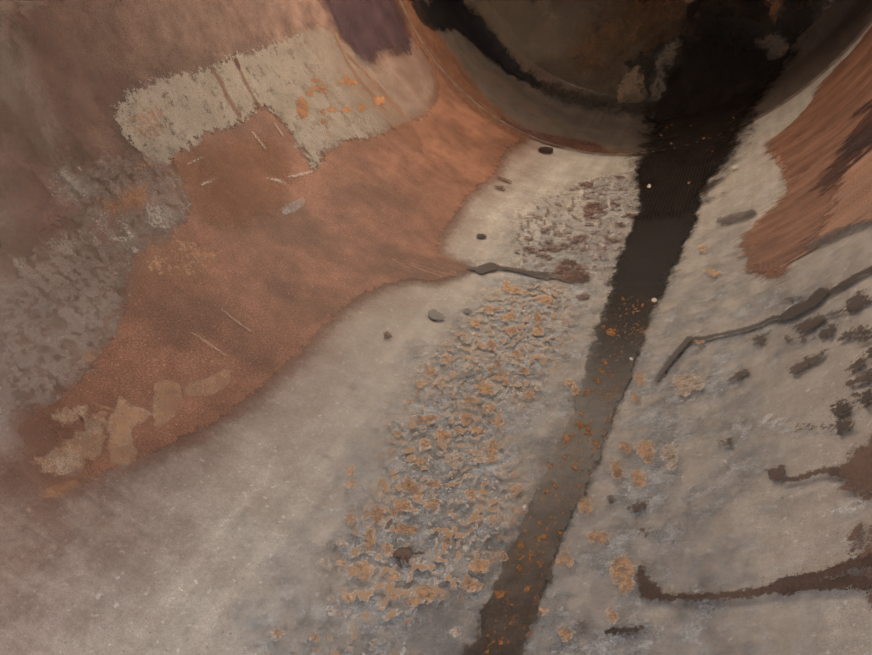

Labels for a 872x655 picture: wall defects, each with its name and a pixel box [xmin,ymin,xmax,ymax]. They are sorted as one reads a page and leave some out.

peeling [0,31,407,430]
corrosion [0,0,630,490]
corrosion [318,176,637,628]
damp [304,0,872,655]
corrosion [608,440,679,489]
corrosion [673,373,705,399]